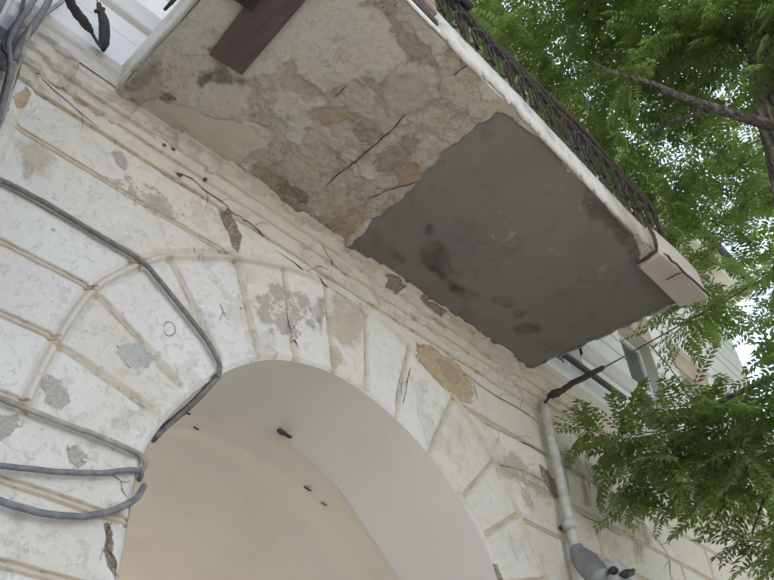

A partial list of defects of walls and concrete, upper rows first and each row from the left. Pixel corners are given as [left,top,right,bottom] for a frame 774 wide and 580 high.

flaking render [379,0,436,68]
crack [326,114,407,186]
crack [367,164,419,200]
flaking render [219,210,242,251]
crack [175,173,352,307]
peeling [254,284,316,342]
flaking render [386,274,406,295]
crack [637,220,710,297]
peeling [41,374,72,410]
flaking render [417,344,474,404]
peeling [0,414,23,442]
flaking render [102,523,118,579]